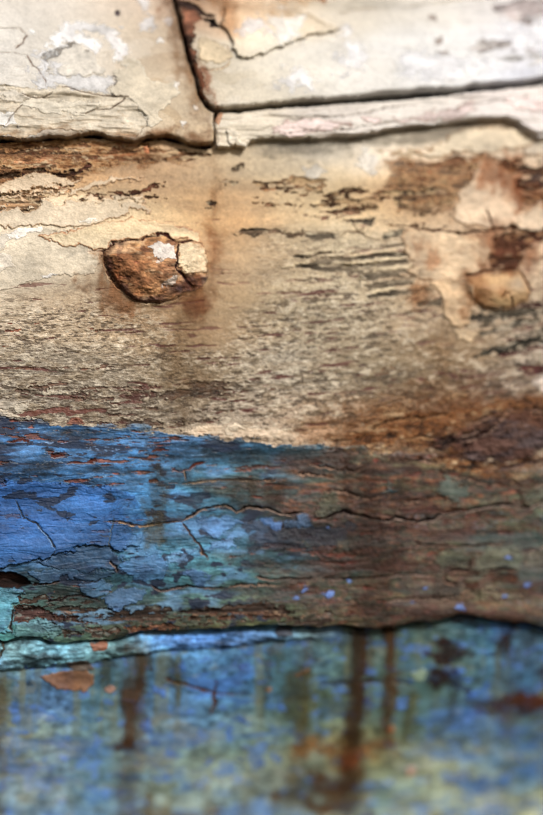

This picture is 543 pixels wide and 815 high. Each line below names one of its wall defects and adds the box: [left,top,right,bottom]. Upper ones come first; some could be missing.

crack [1,28,127,122]
peeling [398,0,543,83]
peeling [0,21,212,291]
peeling [233,97,543,392]
crack [50,453,99,464]
crack [0,609,14,658]
crack [16,501,56,563]
crack [33,581,100,603]
peeling [0,478,332,651]
peeling [197,491,357,553]
crack [105,414,543,603]
peeling [41,660,94,693]